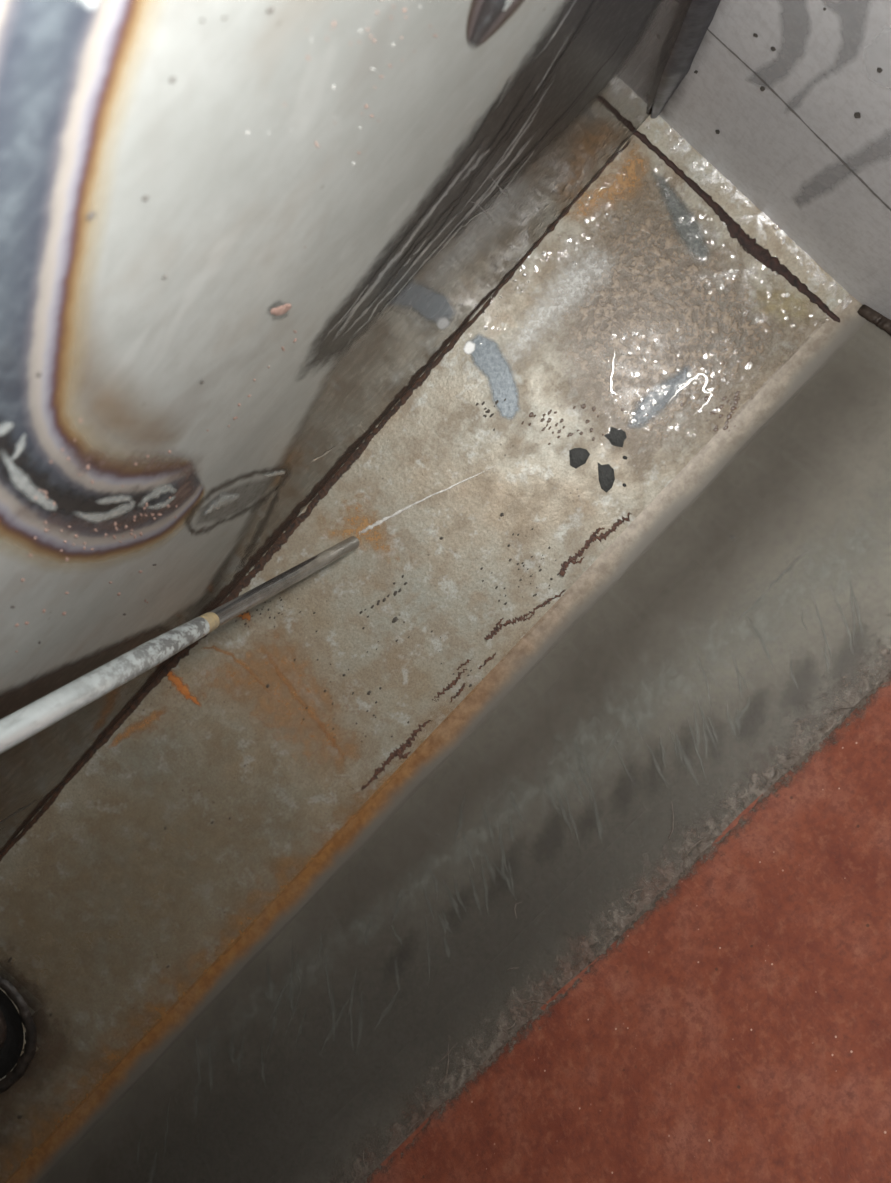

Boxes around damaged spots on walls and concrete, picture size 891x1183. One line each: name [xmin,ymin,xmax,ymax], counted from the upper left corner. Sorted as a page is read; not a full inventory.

water stain [0,0,692,720]
crack [218,130,840,607]
water stain [0,653,177,855]
crack [0,634,208,861]
crack [361,512,631,789]